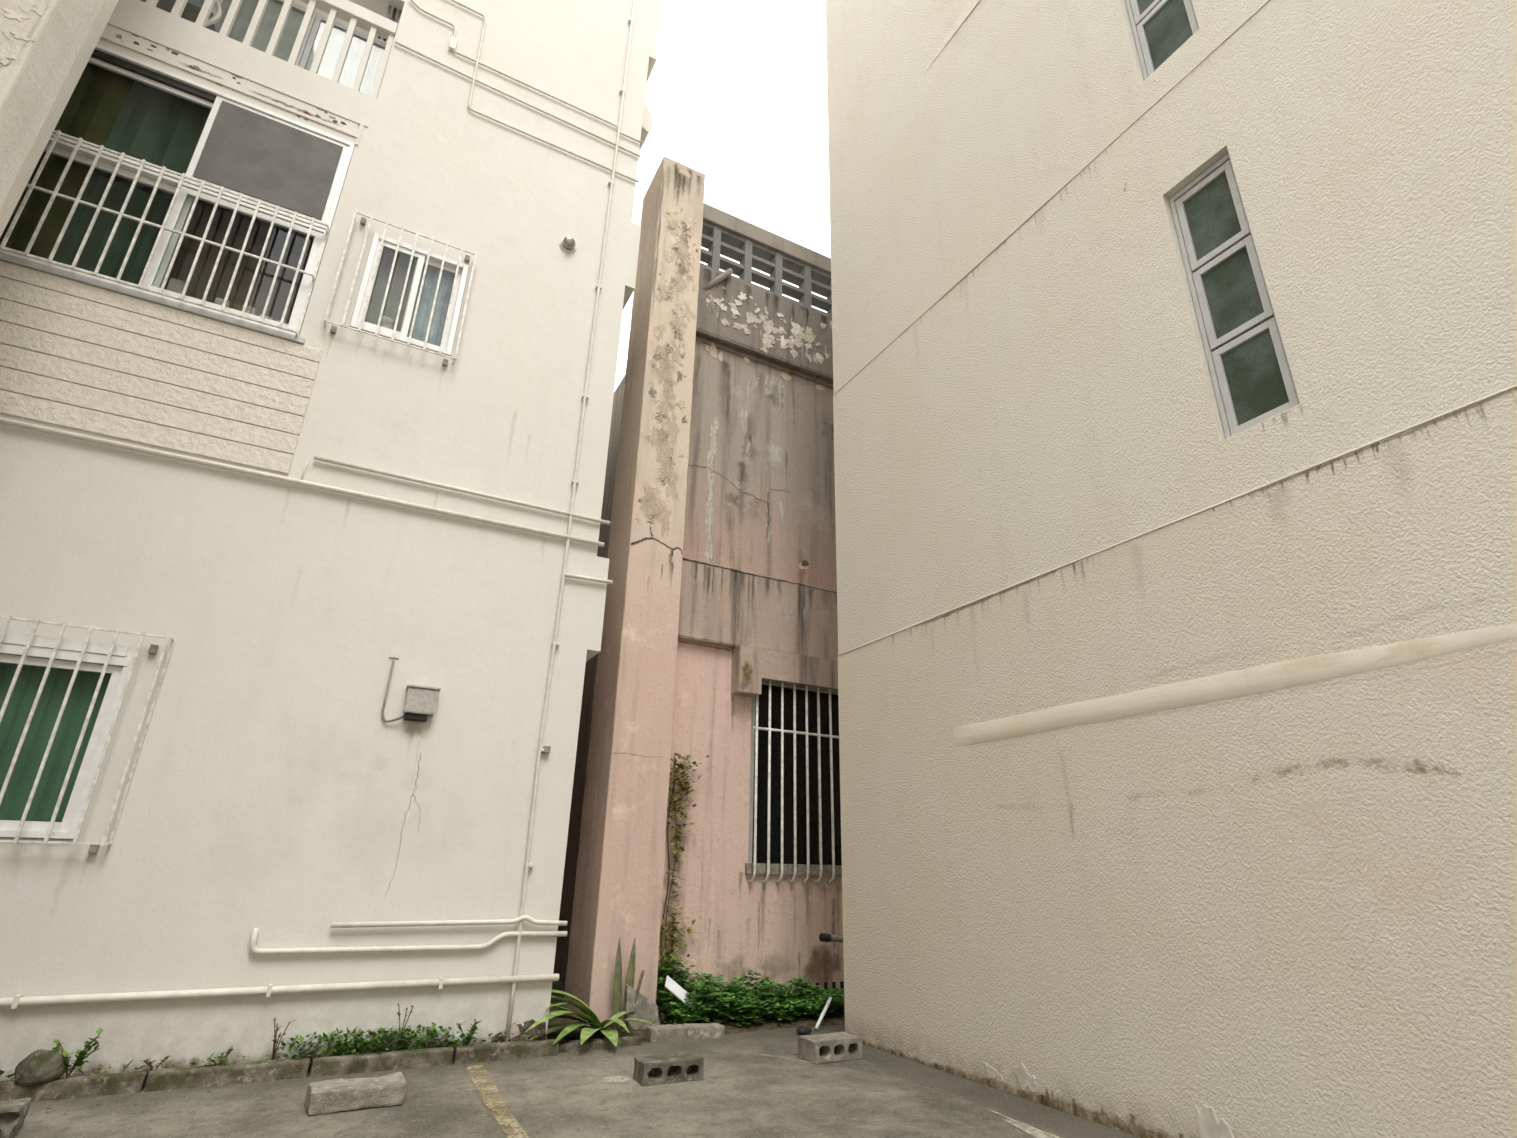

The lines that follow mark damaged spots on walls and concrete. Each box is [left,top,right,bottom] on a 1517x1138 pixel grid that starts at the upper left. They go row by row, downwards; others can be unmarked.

peeling [116,33,243,86]
peeling [291,106,347,125]
peeling [635,209,832,533]
damp [1267,390,1513,488]
damp [696,416,718,583]
damp [923,571,1055,624]
damp [862,1040,1182,1138]